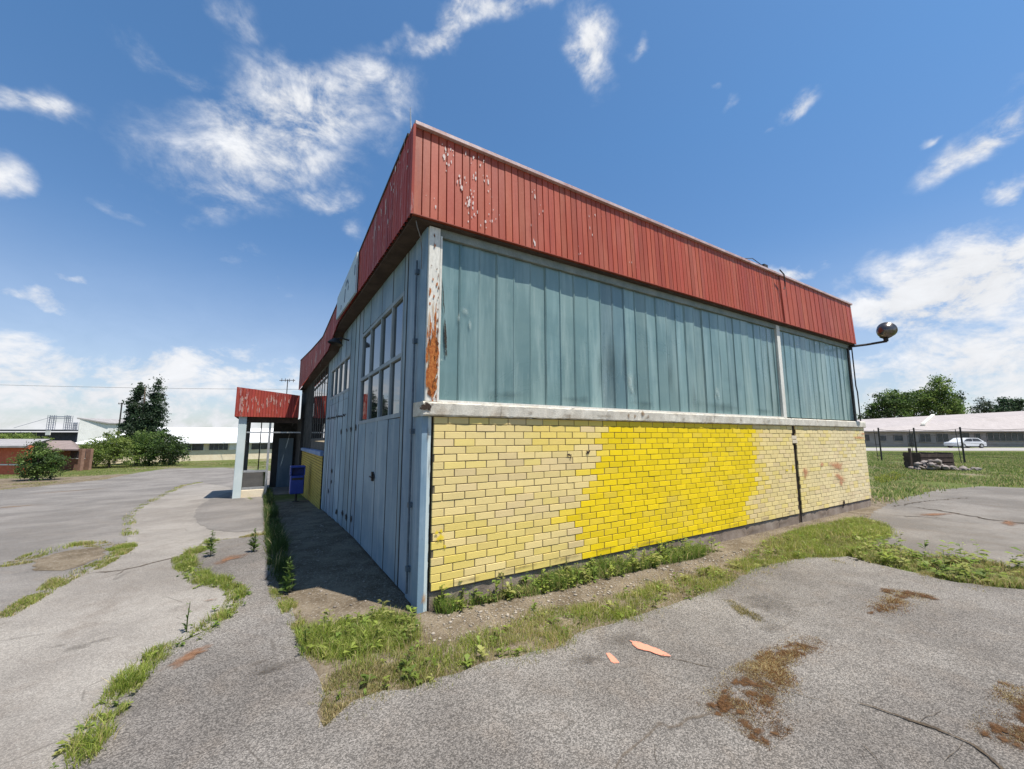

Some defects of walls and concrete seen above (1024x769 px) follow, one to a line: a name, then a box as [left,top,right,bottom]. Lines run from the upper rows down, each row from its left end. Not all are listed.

peeling [443,147,500,226]
corrosion [426,265,439,402]
crack [858,702,1004,769]